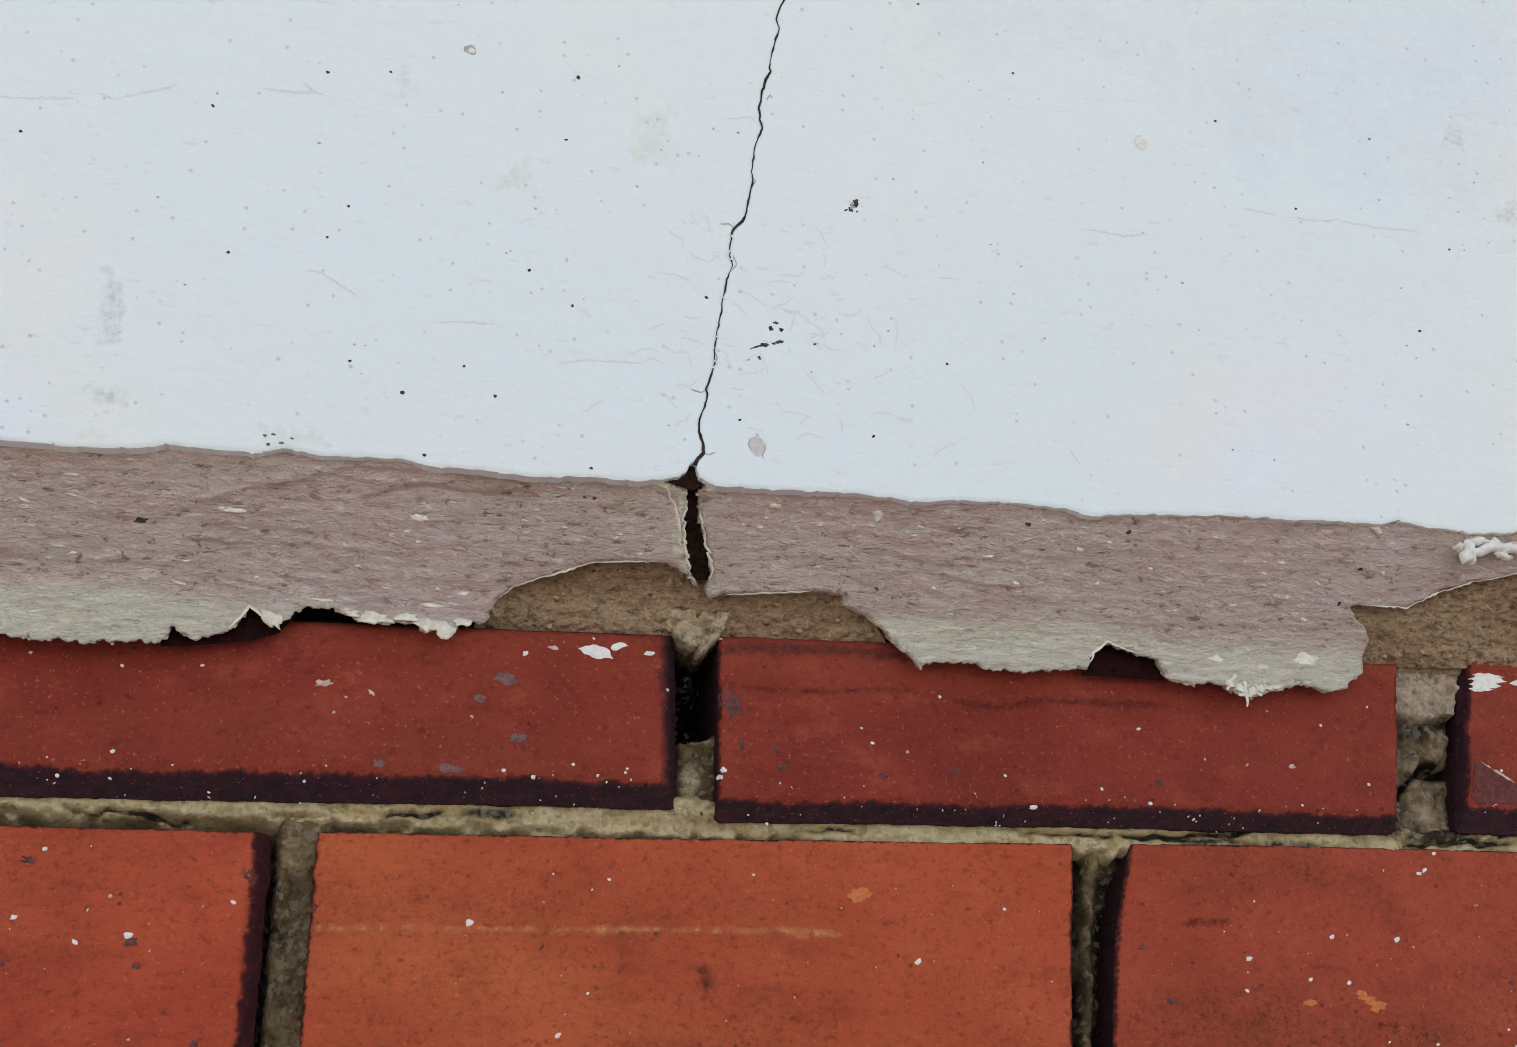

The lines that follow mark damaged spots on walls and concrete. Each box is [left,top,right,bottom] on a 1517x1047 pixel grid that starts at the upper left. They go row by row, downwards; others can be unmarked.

crack [553,0,959,583]
peeling [218,506,268,529]
peeling [388,513,430,543]
spalling [313,553,886,646]
spalling [1337,536,1517,668]
spalling [160,605,299,647]
spalling [1081,640,1164,681]
peeling [1208,636,1282,707]
peeling [1293,652,1319,665]